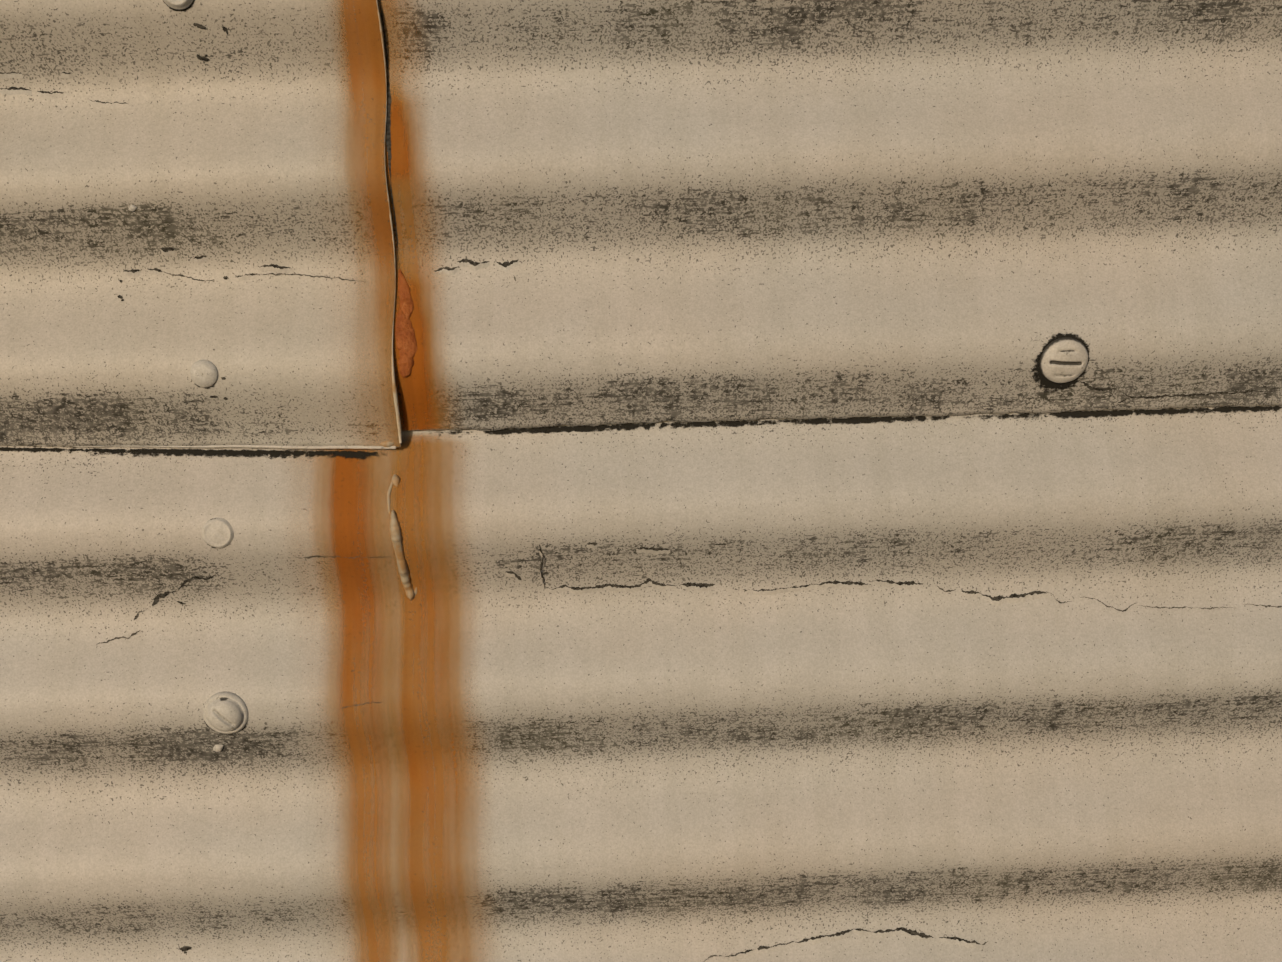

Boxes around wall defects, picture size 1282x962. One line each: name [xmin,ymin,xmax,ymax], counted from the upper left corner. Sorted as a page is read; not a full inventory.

crack [380,4,400,272]
crack [124,247,364,282]
crack [433,259,519,281]
rust [331,0,464,962]
crack [96,575,215,645]
crack [587,542,597,550]
crack [506,545,1282,612]
crack [704,927,989,962]